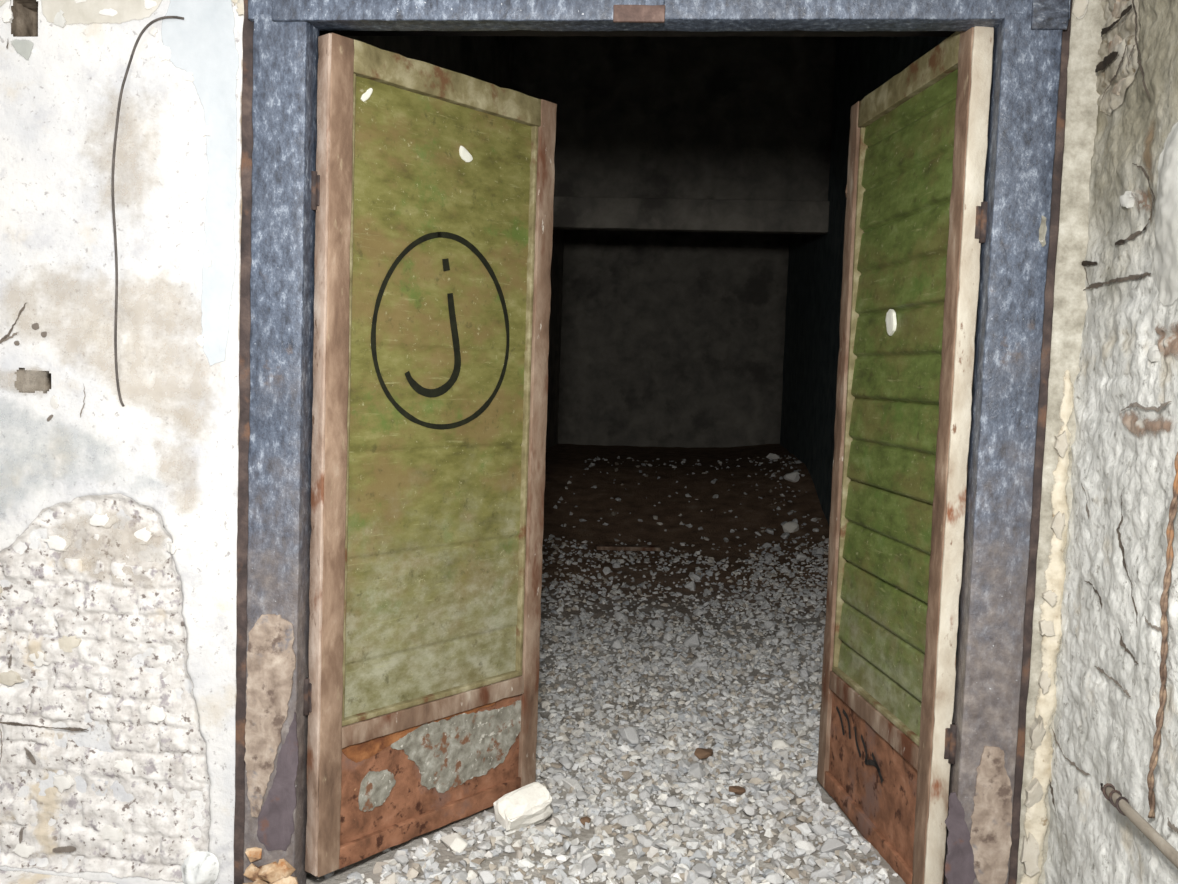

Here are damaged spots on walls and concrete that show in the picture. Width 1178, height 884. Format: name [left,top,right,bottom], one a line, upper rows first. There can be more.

flaking render [1072,0,1140,116]
peeling [0,0,244,366]
crack [0,303,26,343]
flaking render [0,493,211,884]
peeling [244,614,296,817]
flaking render [970,370,1074,884]
crack [1049,729,1091,817]
crack [1085,488,1161,697]
crack [1167,818,1178,833]